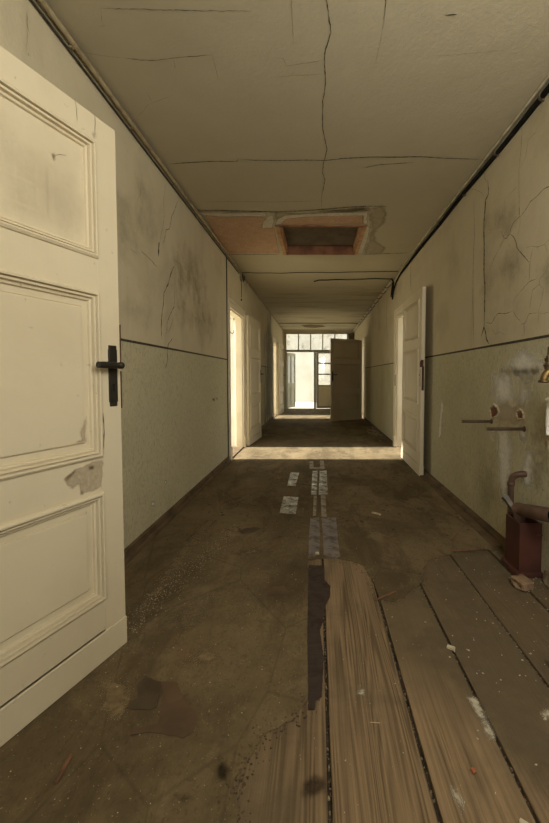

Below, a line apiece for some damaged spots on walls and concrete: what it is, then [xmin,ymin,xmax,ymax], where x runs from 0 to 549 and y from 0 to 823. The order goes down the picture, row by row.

crack [175,1,549,345]
flaking render [282,216,363,225]
crack [132,191,178,366]
damp [494,353,542,404]
peeling [65,462,103,493]